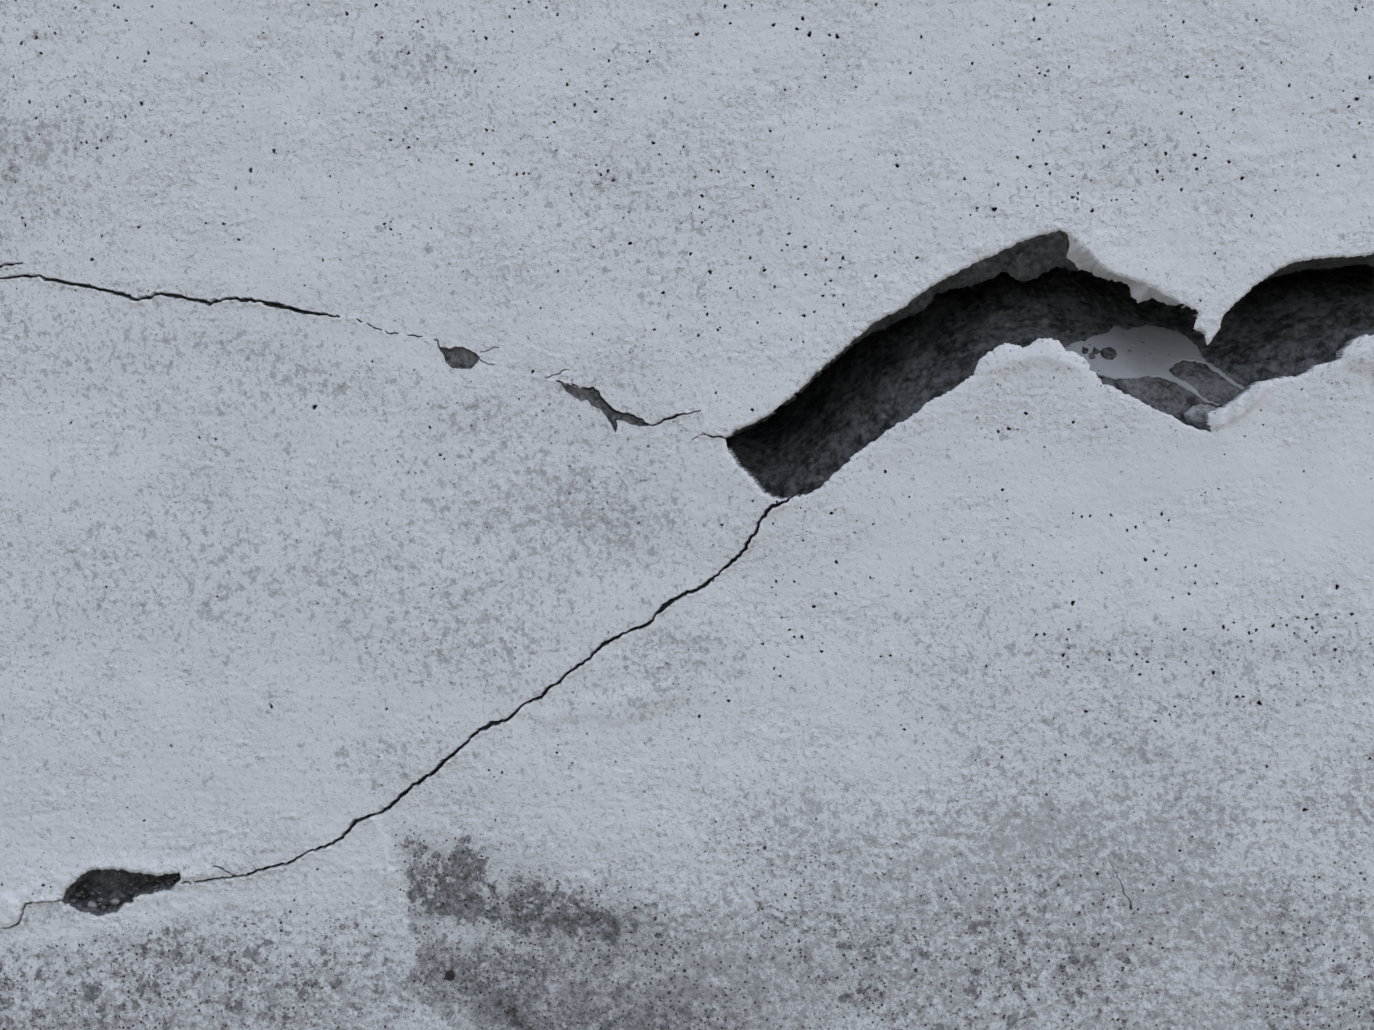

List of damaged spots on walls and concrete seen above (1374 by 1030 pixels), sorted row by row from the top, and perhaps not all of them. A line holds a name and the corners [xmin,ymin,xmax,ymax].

crack [0,261,440,353]
crack [479,346,499,366]
crack [544,369,570,379]
spalling [726,230,1374,503]
crack [649,410,726,441]
crack [179,496,798,889]
crack [0,896,63,929]
spalling [53,863,186,923]
leakage [393,822,685,957]
leakage [445,970,535,1030]